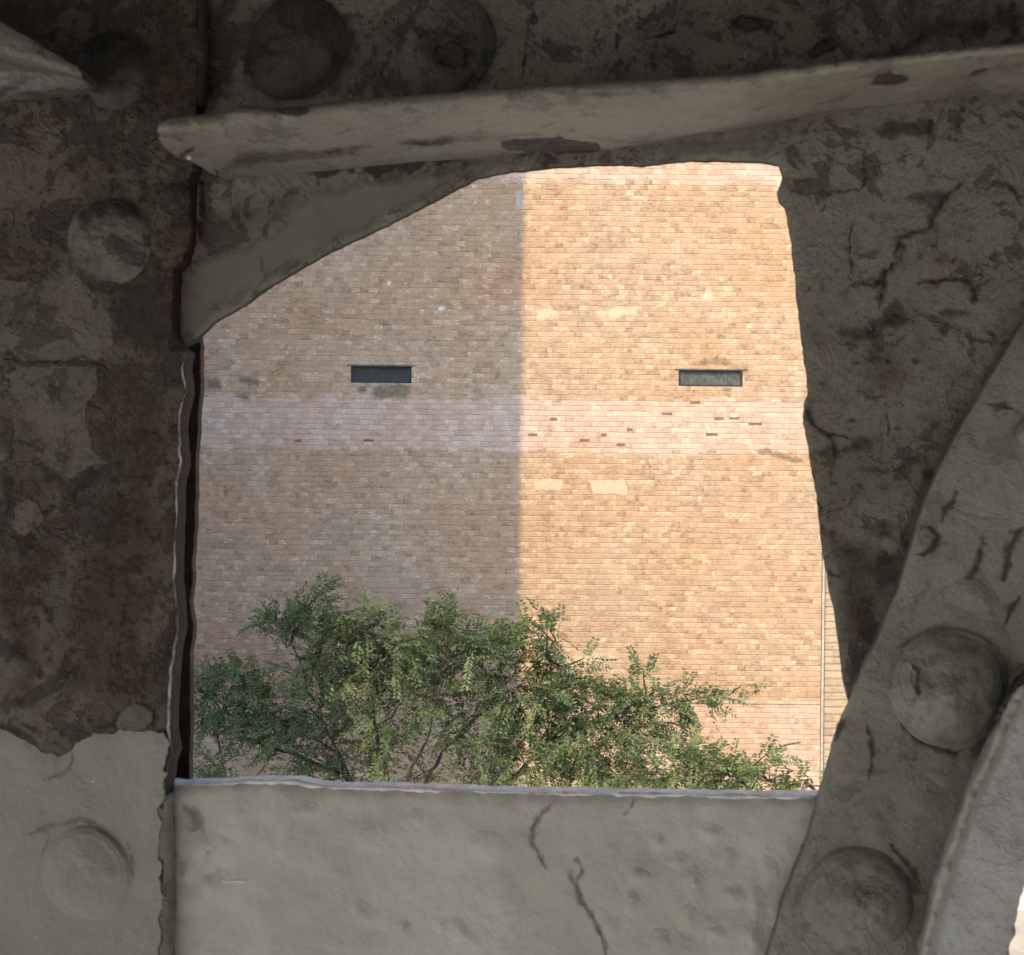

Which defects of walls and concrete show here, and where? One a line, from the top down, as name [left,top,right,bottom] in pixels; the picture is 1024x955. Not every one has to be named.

crack [850,183,960,298]
crack [928,277,970,285]
crack [806,408,848,456]
crack [916,499,956,555]
crack [967,530,1021,617]